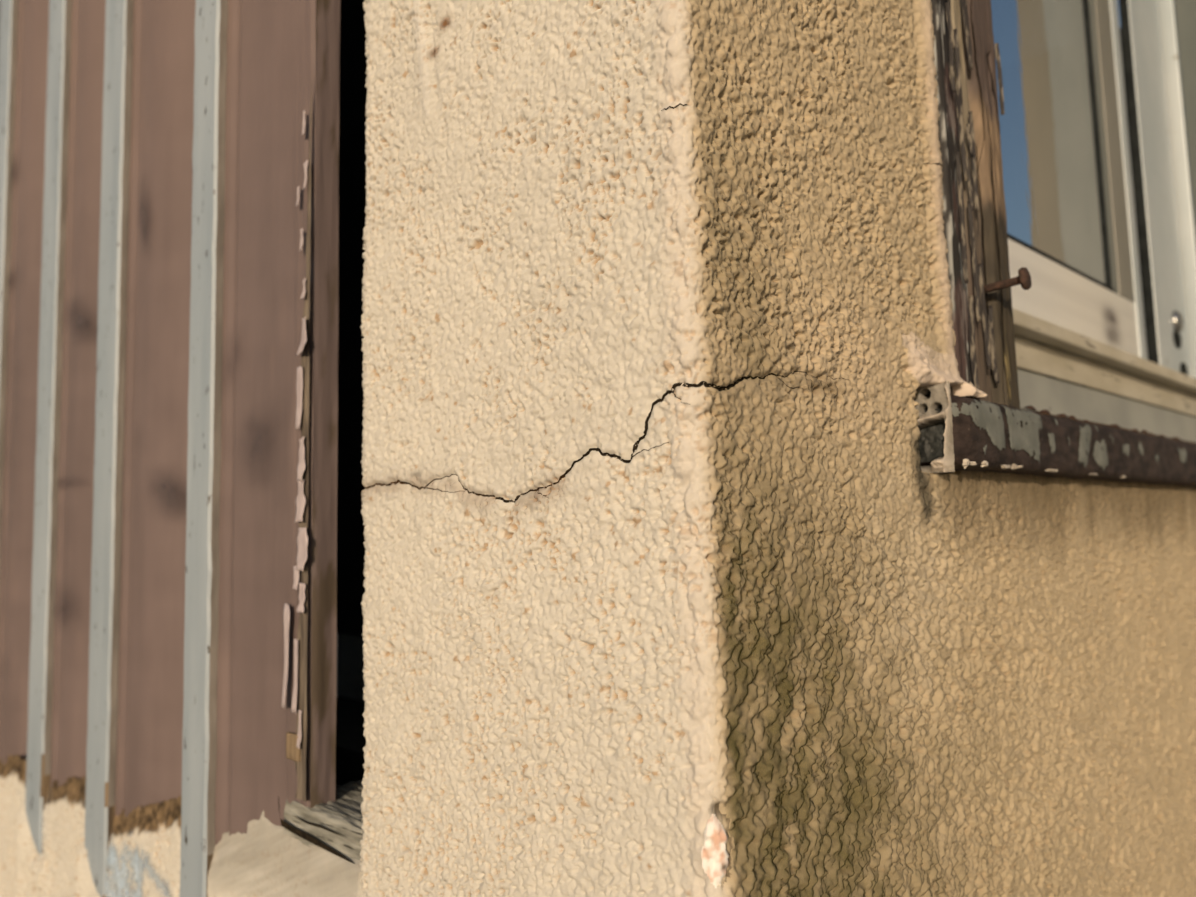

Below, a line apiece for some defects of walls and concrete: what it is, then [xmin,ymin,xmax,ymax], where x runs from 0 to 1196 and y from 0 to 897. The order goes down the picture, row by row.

peeling [281,80,312,802]
crack [365,371,847,503]
spalling [901,0,1159,475]